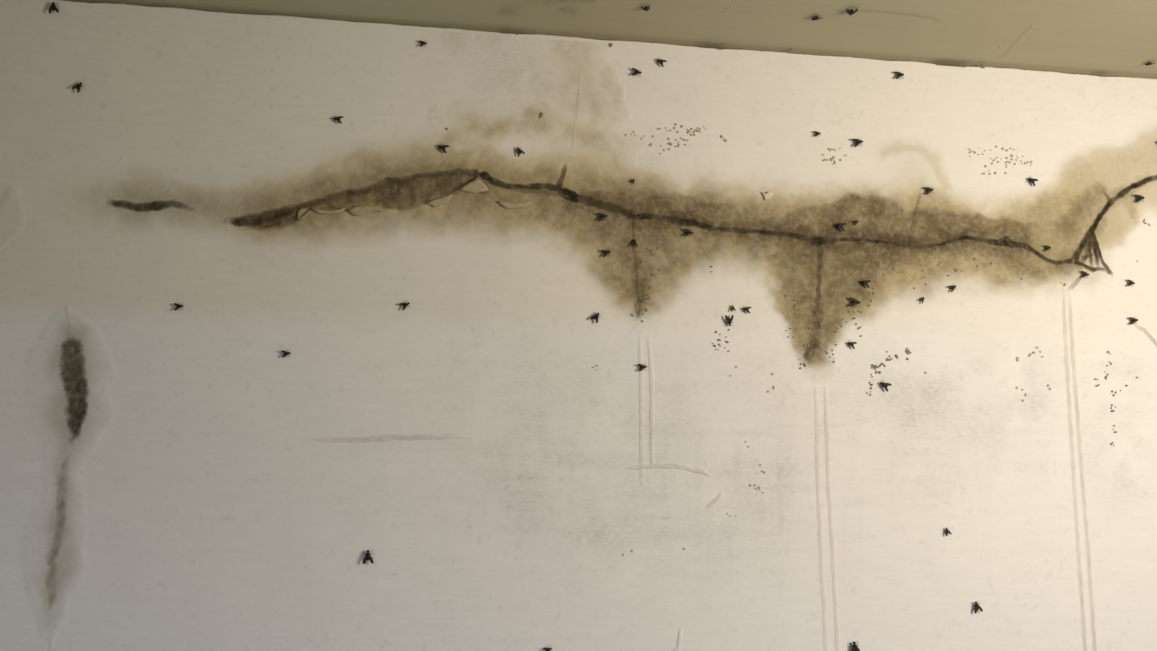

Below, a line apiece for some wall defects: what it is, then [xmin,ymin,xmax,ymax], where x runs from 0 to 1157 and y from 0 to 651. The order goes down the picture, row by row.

leakage [17,303,121,651]
flaking render [223,168,488,232]
leakage [35,126,1157,651]
leakage [424,31,1157,260]
crack [479,163,1157,317]
crack [1134,322,1157,348]